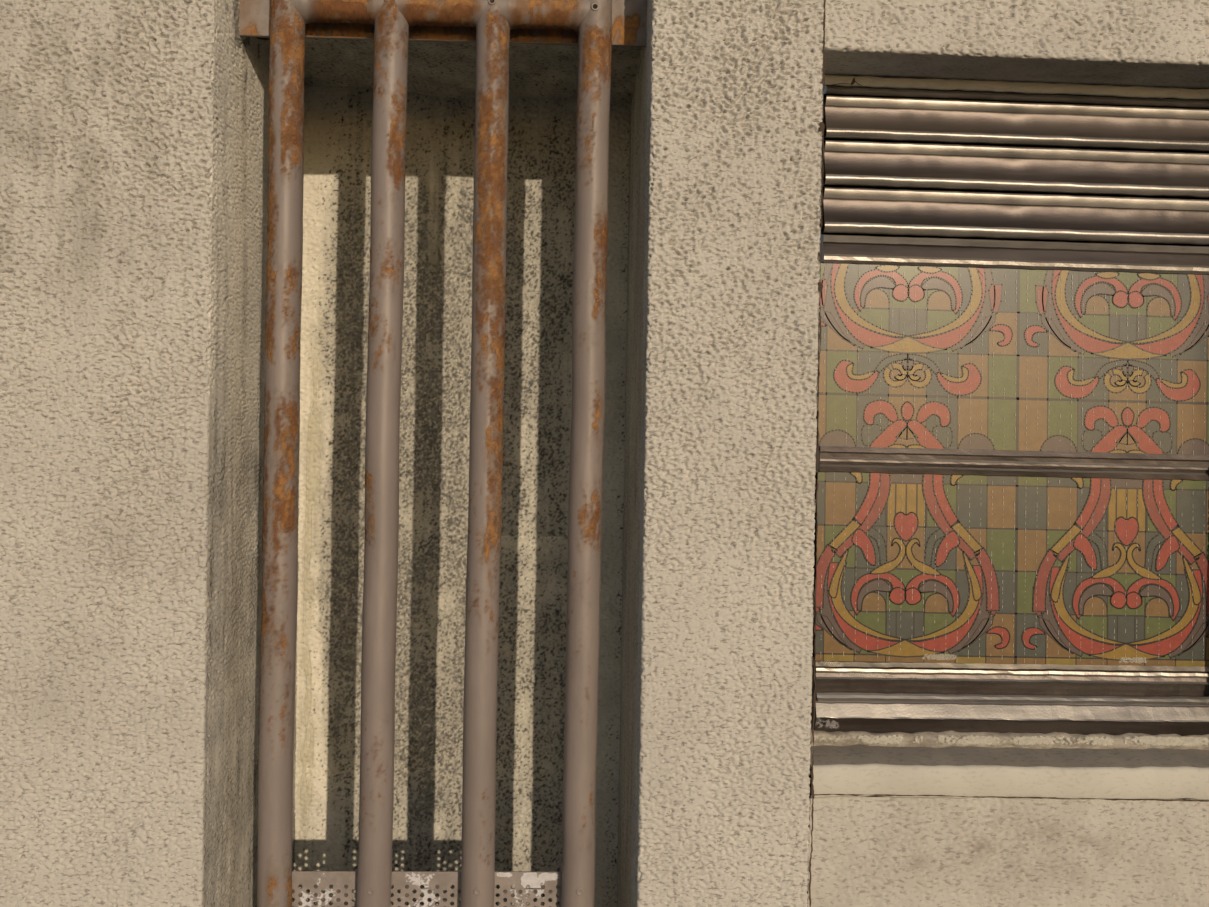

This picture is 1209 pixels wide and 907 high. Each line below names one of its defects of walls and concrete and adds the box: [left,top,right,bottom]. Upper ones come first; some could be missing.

corrosion [261,393,299,649]
corrosion [268,876,292,907]
leakage [294,90,371,857]
leakage [392,85,473,871]
corrosion [244,0,640,578]
leakage [496,99,575,871]